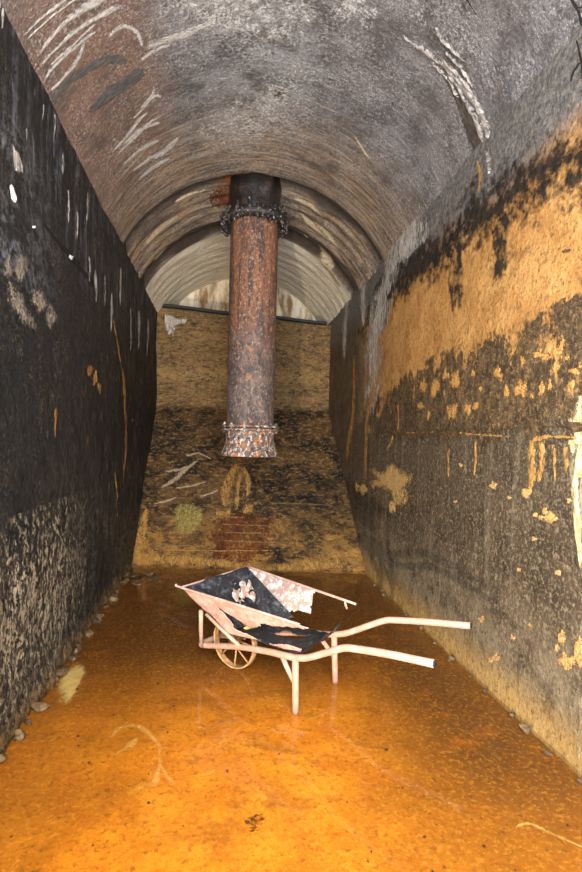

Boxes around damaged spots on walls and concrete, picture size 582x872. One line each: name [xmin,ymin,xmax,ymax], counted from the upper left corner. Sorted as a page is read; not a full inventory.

damp [112,88,179,180]
damp [24,0,311,134]
damp [199,70,318,154]
damp [324,0,377,27]
peeling [402,22,492,175]
crack [570,0,582,81]
rust [209,172,245,207]
damp [89,257,122,329]
damp [130,308,149,353]
damp [360,213,437,414]
rust [113,321,127,516]
damp [568,396,582,567]